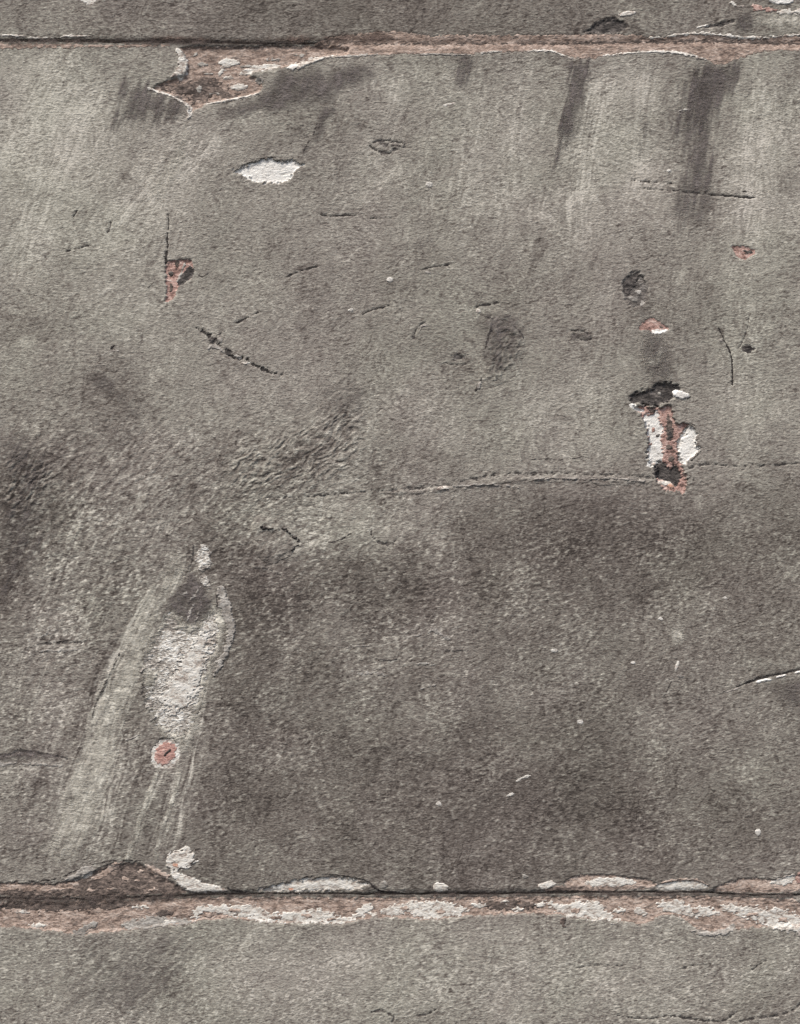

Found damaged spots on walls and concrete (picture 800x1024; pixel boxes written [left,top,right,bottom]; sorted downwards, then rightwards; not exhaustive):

spalling [0,34,384,119]
flaking render [233,157,305,185]
leakage [555,58,590,161]
leakage [676,63,739,218]
crack [196,312,283,376]
crack [718,318,756,386]
spalling [628,381,701,496]
crack [267,456,654,499]
crack [723,668,800,701]
rust [151,735,182,769]
leakage [126,771,158,859]
spalling [0,846,402,899]